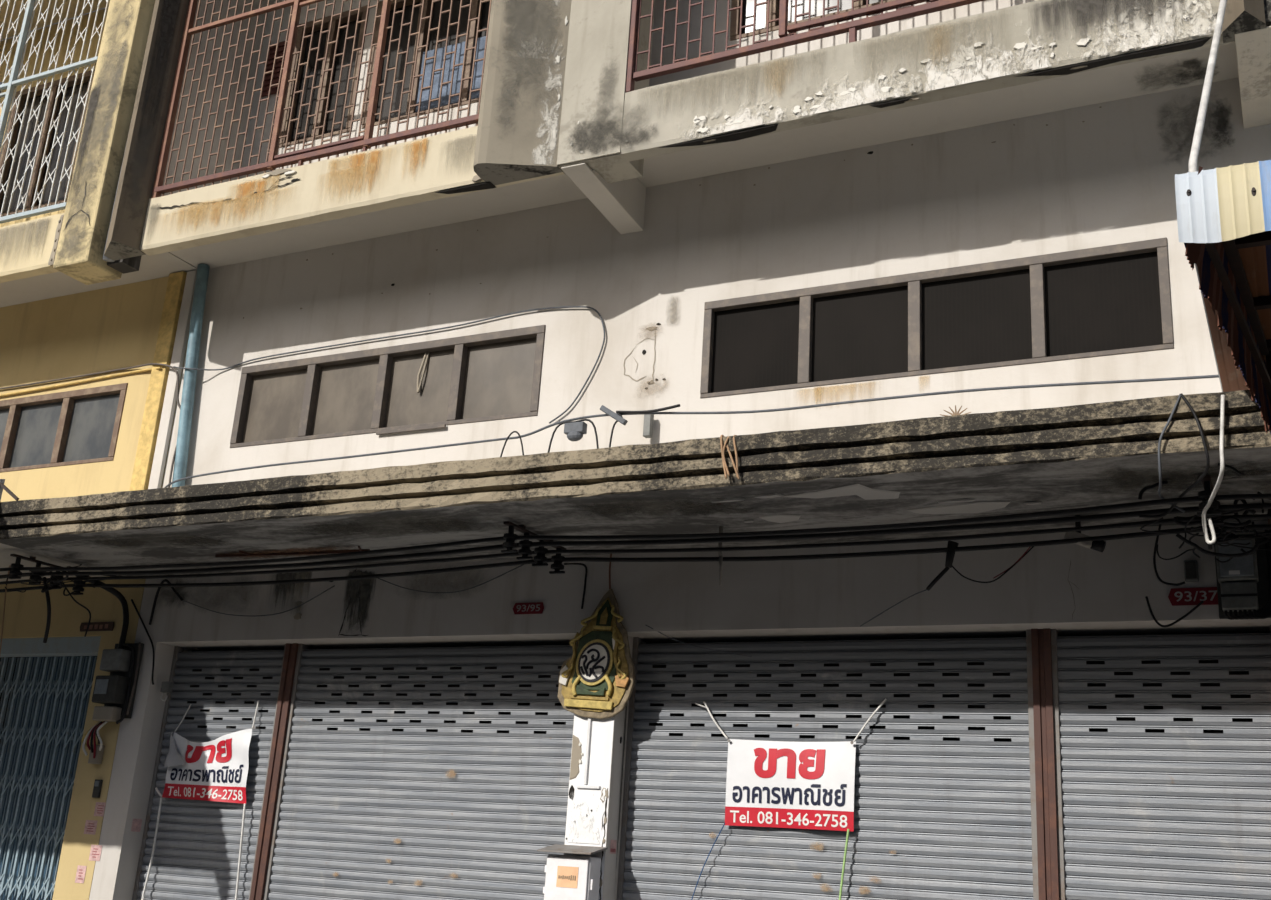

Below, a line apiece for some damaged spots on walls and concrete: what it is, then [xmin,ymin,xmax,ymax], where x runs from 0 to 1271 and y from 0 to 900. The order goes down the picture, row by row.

peeling [518,39,562,165]
water stain [570,69,647,153]
peeling [658,0,1216,148]
water stain [1142,59,1205,84]
water stain [1173,103,1229,151]
water stain [344,570,376,625]